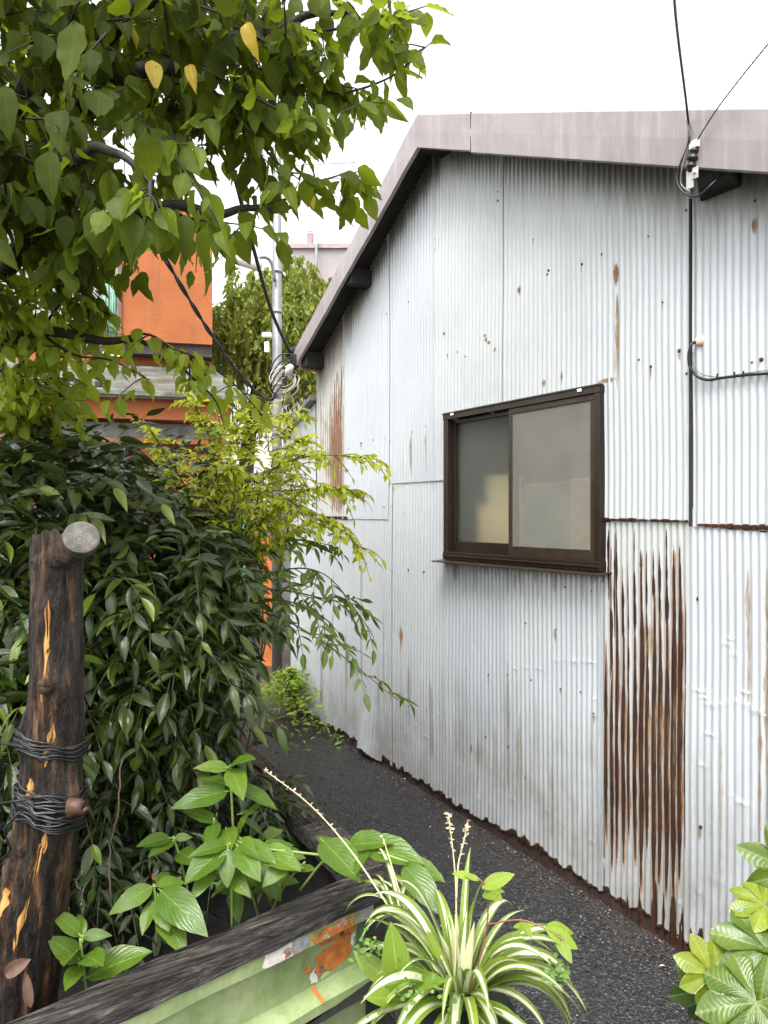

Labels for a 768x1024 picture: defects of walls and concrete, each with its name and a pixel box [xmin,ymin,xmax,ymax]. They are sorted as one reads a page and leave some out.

rust [320,366,348,520]
rust [382,517,768,952]